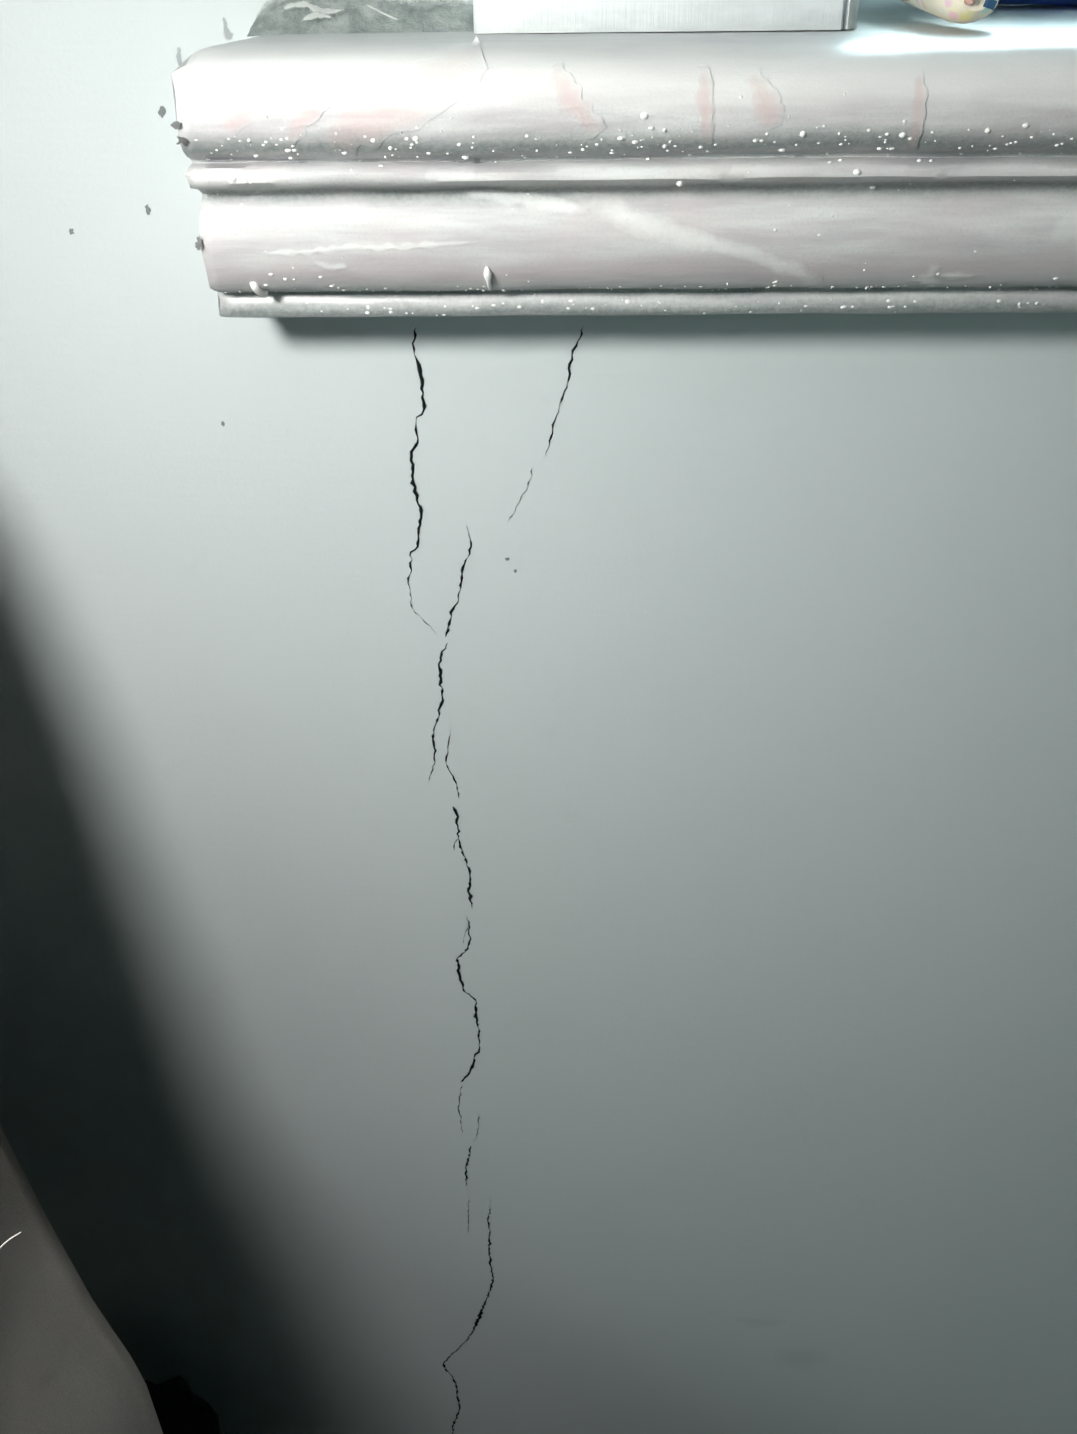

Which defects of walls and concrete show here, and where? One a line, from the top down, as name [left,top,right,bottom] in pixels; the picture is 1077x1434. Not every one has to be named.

crack [407,328,494,1434]
crack [509,327,584,519]